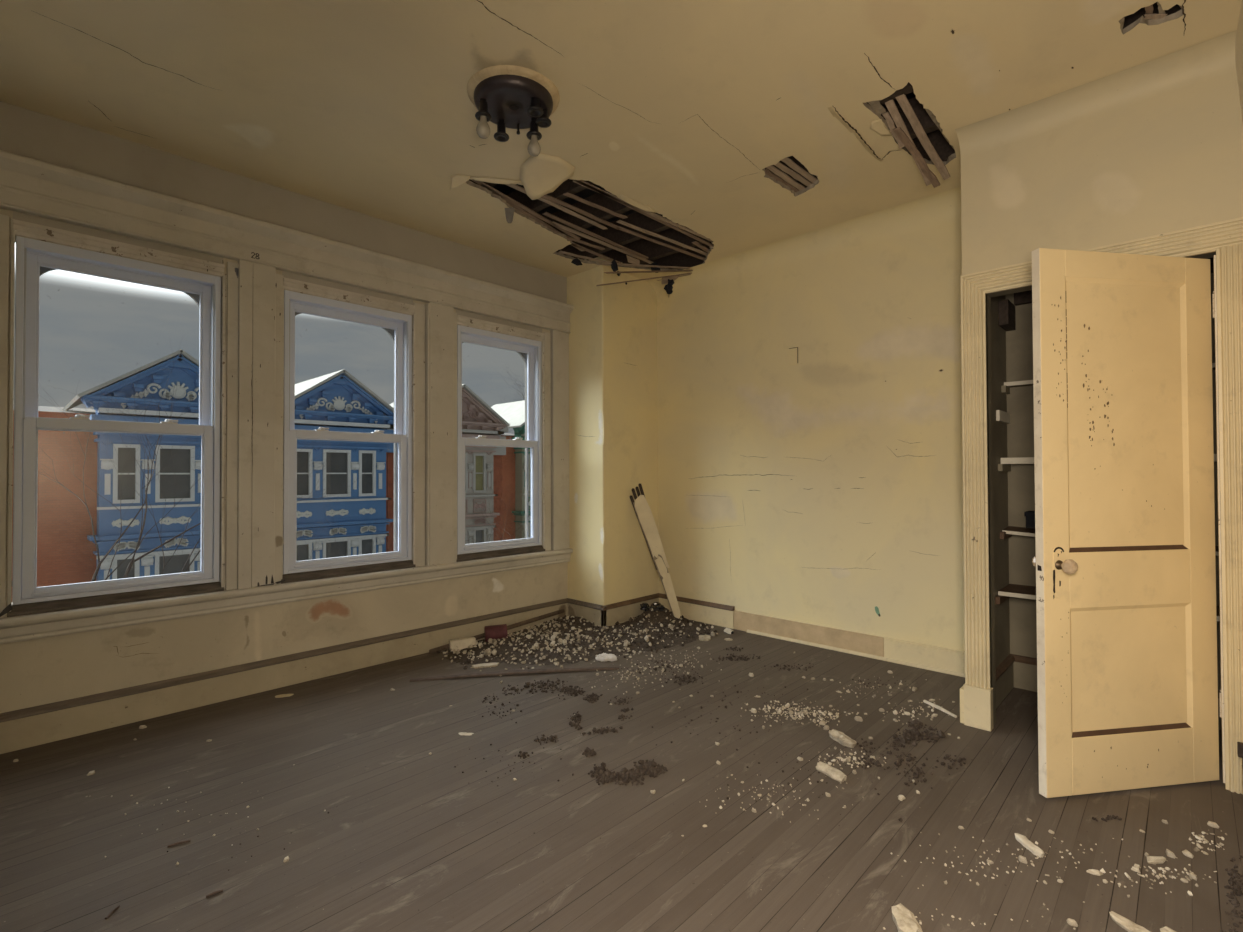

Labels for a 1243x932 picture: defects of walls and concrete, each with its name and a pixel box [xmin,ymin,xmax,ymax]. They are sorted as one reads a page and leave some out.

crack [477,0,563,56]
crack [828,107,899,161]
peeling [450,154,575,200]
peeling [619,195,657,213]